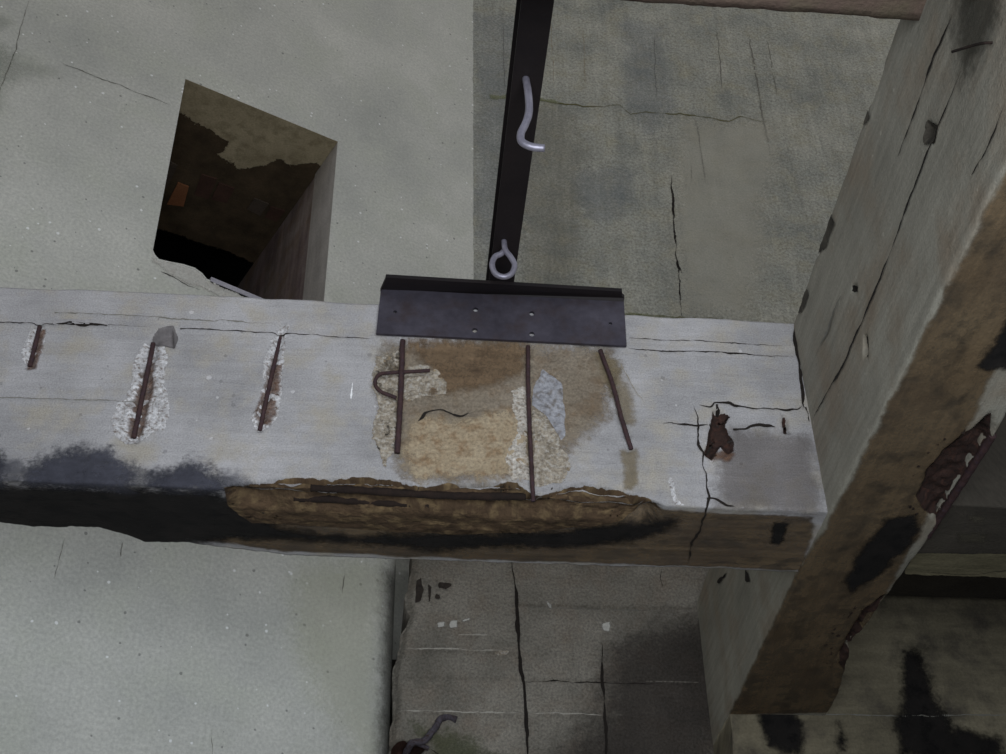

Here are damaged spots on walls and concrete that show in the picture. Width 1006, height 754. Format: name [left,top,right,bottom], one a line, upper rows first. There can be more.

crack [0,312,360,338]
crack [540,19,961,563]
damp [0,445,248,495]
corrosion [129,363,154,438]
spalling [110,326,178,444]
corrosion [257,361,281,425]
spalling [224,324,658,535]
corrosion [377,339,632,484]
corrosion [622,452,637,489]
spalling [704,413,734,460]
crack [512,567,636,754]
spalling [391,714,457,754]